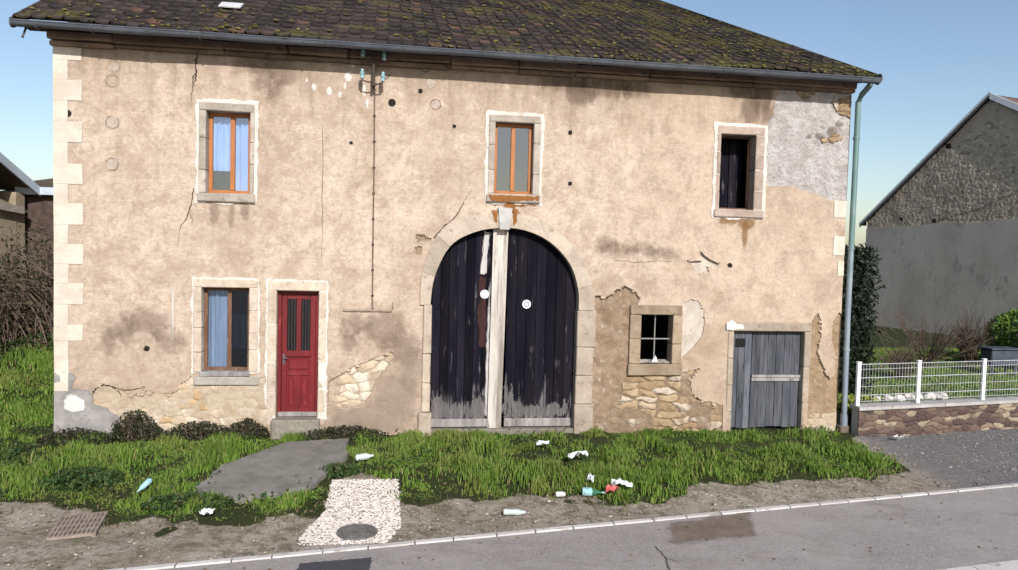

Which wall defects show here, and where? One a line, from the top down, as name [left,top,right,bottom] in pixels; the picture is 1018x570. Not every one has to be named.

crack [191,54,199,101]
peeling [766,90,852,202]
crack [177,189,194,247]
spalling [92,374,267,438]
spalling [328,351,394,407]
spalling [592,286,723,433]
peeling [807,314,840,431]